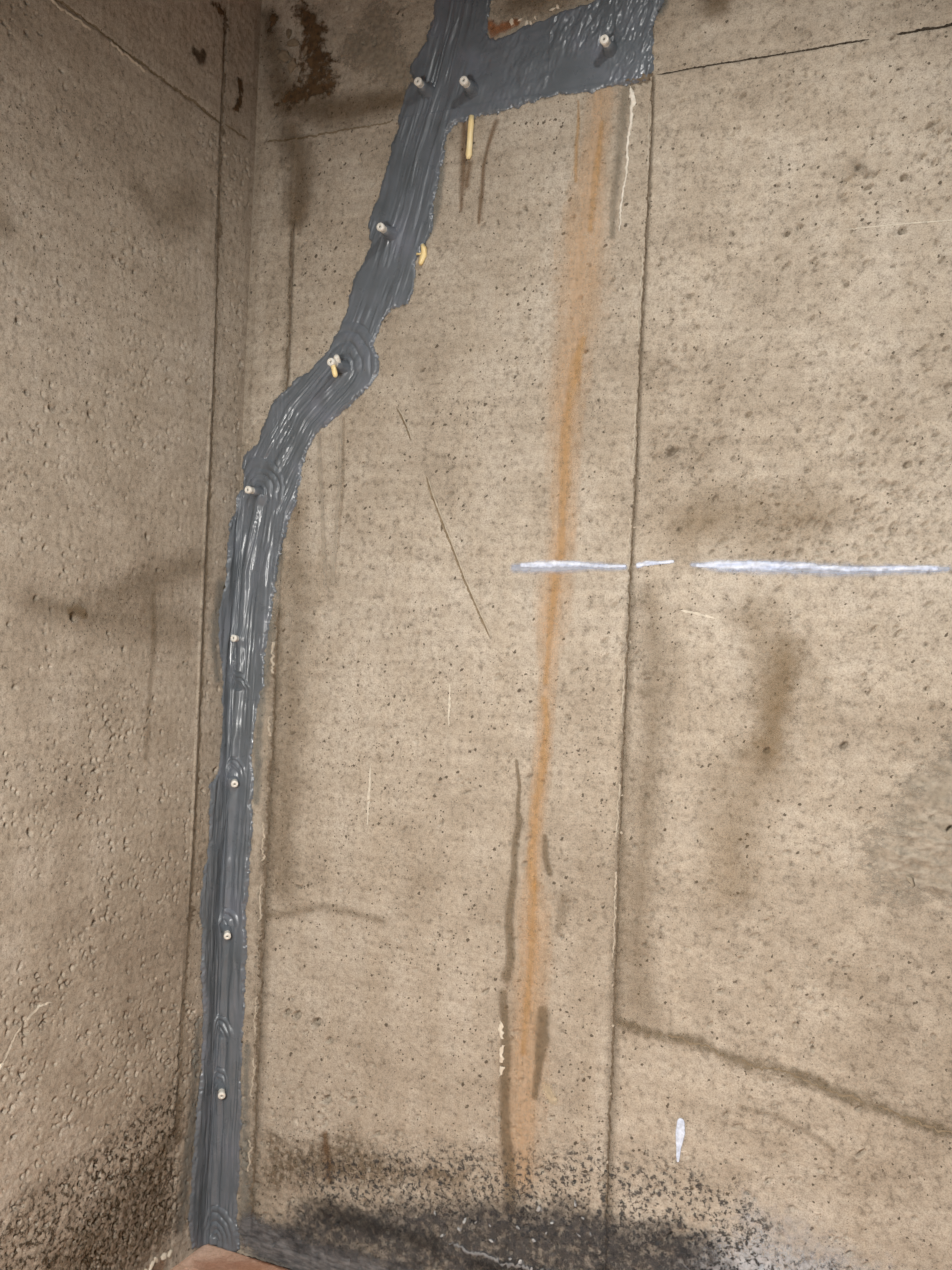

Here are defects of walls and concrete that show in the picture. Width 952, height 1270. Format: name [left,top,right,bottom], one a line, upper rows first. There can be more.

crack [619,1021,952,1135]
damp [0,1088,176,1270]
damp [286,1147,833,1270]